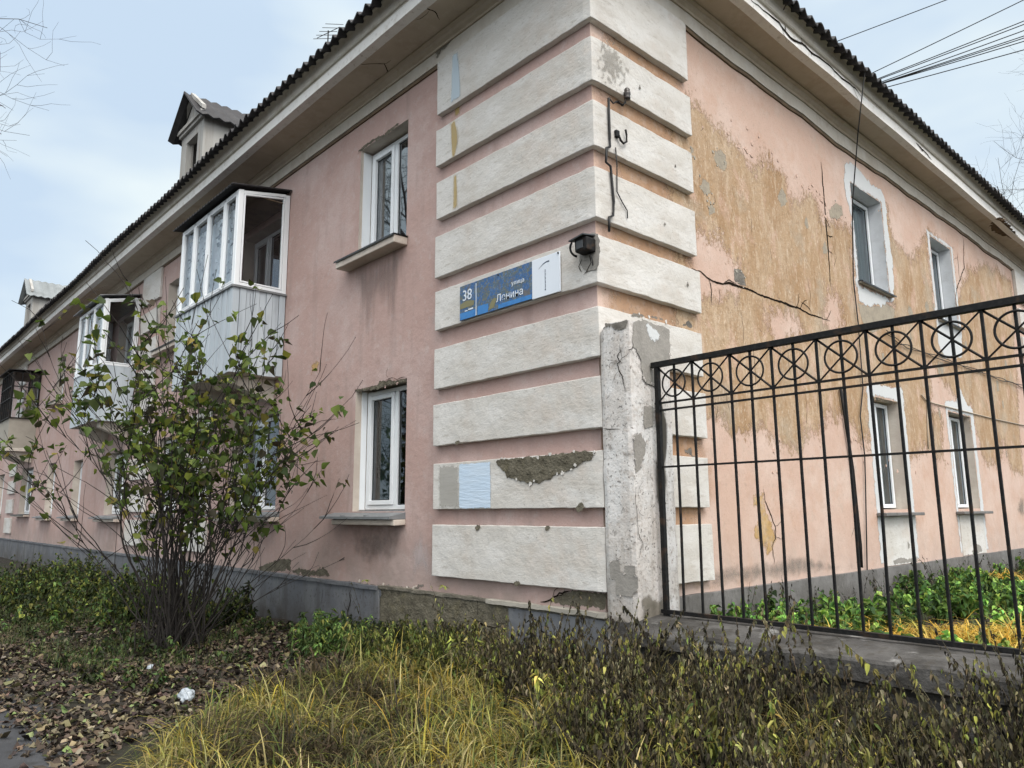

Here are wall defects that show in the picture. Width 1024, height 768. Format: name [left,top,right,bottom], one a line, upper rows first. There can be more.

crack [821,165,832,283]
crack [692,268,831,321]
peeling [605,91,1023,476]
crack [609,347,634,387]
spalling [496,450,596,486]
peeling [753,494,776,554]
peeling [554,558,638,610]